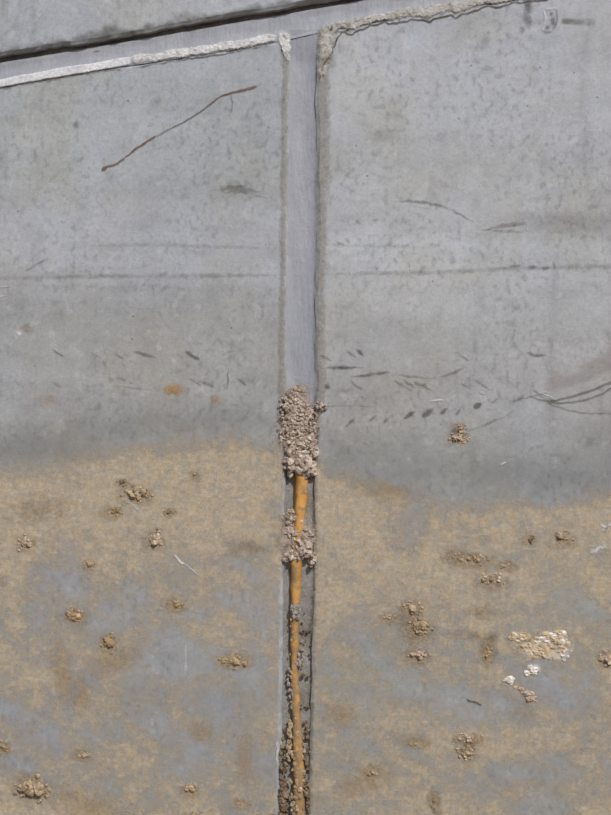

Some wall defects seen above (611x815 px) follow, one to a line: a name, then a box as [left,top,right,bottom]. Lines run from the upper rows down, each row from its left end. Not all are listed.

rust [102,86,257,171]